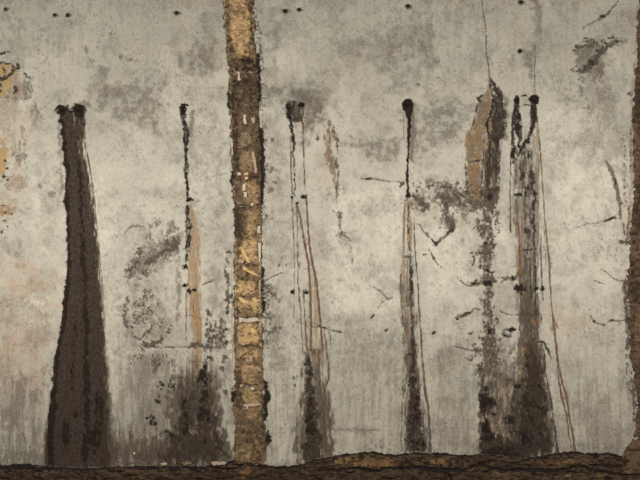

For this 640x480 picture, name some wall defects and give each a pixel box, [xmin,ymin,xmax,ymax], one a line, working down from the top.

damp [0,100,236,468]
spalling [222,0,272,465]
damp [278,89,336,464]
spalling [0,439,640,480]
crack [419,223,455,267]
damp [399,78,576,459]
damp [571,36,623,96]
spalling [619,7,640,440]